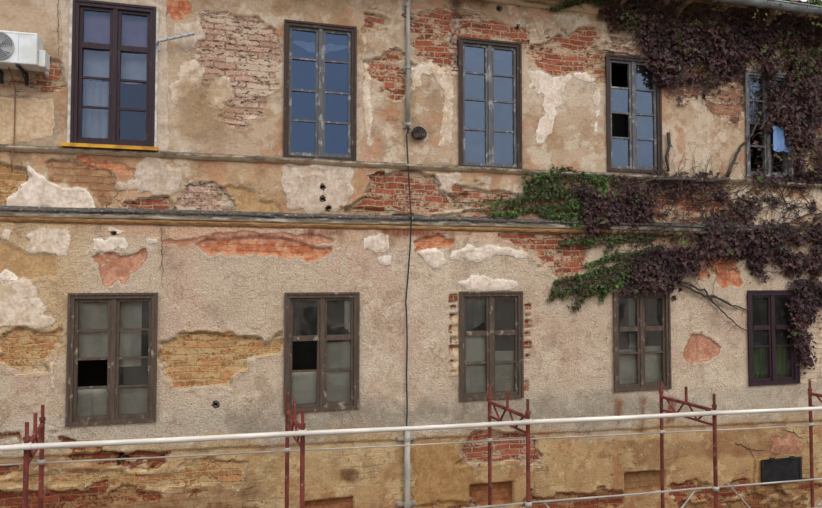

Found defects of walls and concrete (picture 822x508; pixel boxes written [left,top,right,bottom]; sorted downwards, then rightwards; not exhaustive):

flaking render [0,0,822,288]
flaking render [0,226,72,395]
flaking render [157,328,284,408]
flaking render [683,332,721,364]
flaking render [800,306,822,385]
flaking render [0,430,249,508]
flaking render [410,430,544,508]
flaking render [521,486,626,508]
flaking render [668,473,822,508]